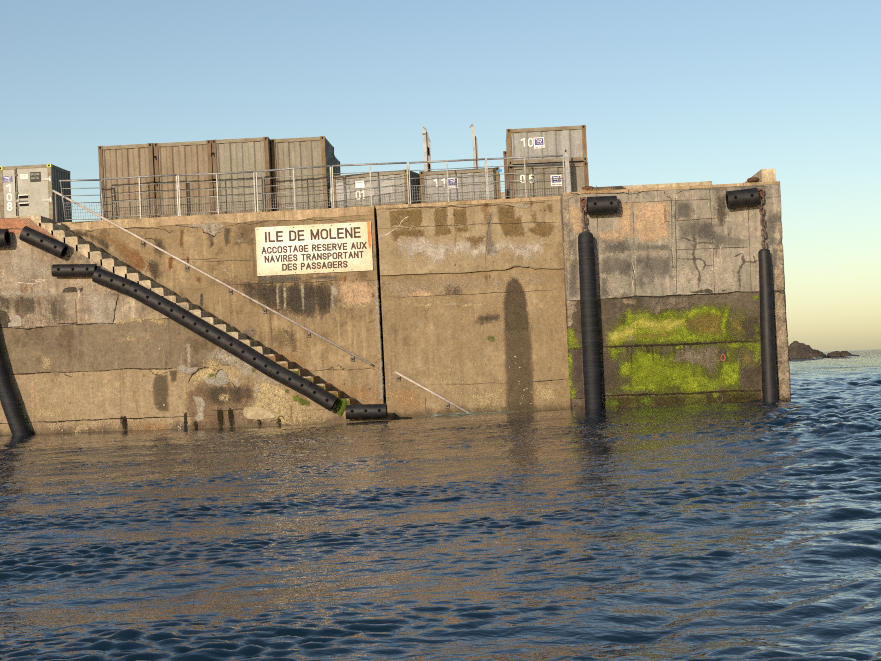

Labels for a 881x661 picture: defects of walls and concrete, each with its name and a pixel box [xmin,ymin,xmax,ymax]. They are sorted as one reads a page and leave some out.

leakage [389,205,553,263]
leakage [244,276,338,318]
crack [605,237,756,299]
leakage [154,344,190,411]
peeling [151,350,305,425]